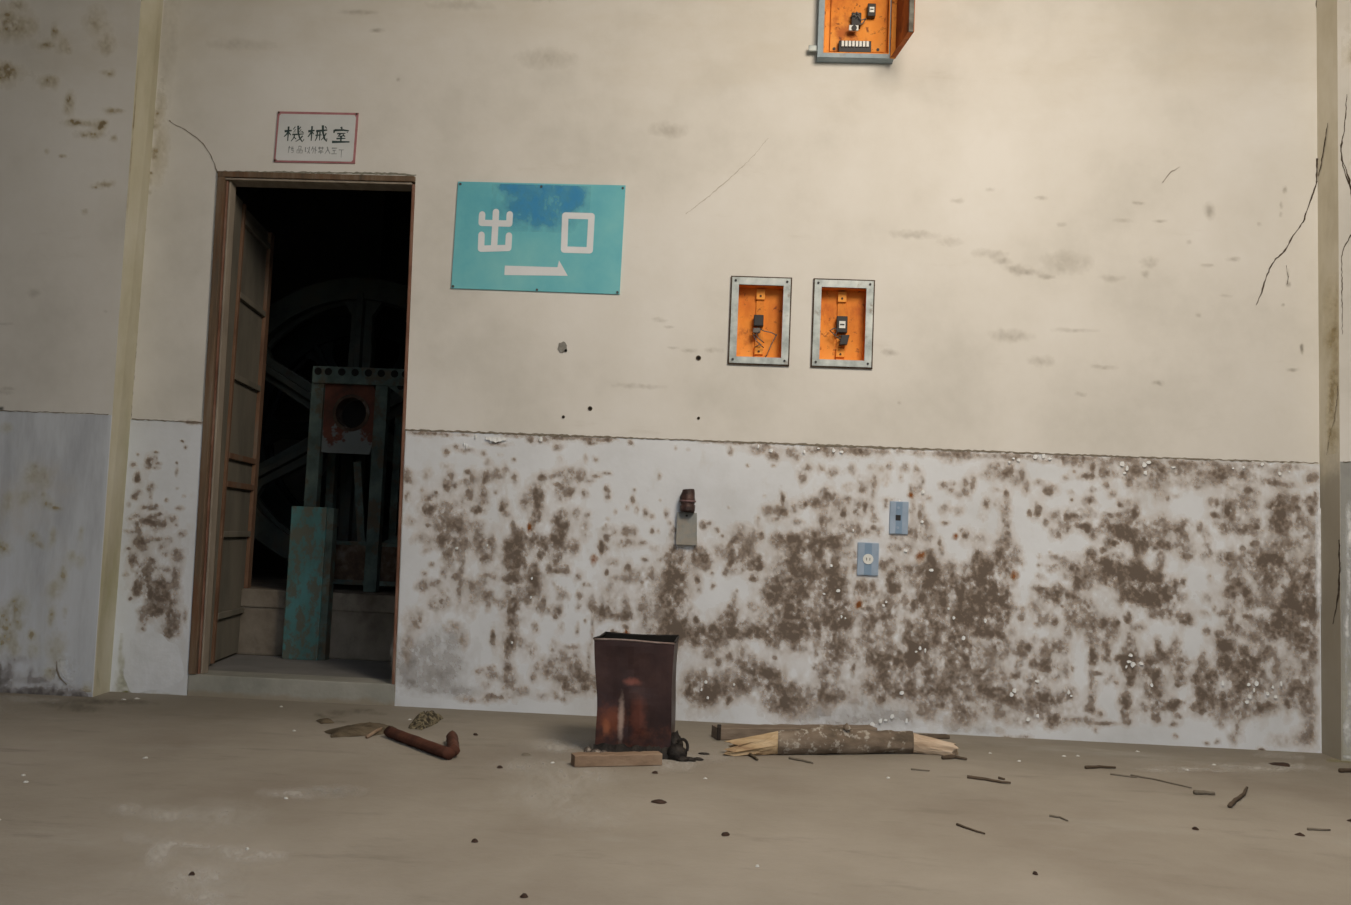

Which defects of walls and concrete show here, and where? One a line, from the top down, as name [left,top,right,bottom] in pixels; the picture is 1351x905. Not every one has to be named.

crack [1256,97,1351,305]
crack [1341,235,1351,334]
water stain [649,527,700,648]
water stain [0,664,88,697]
water stain [398,636,465,694]